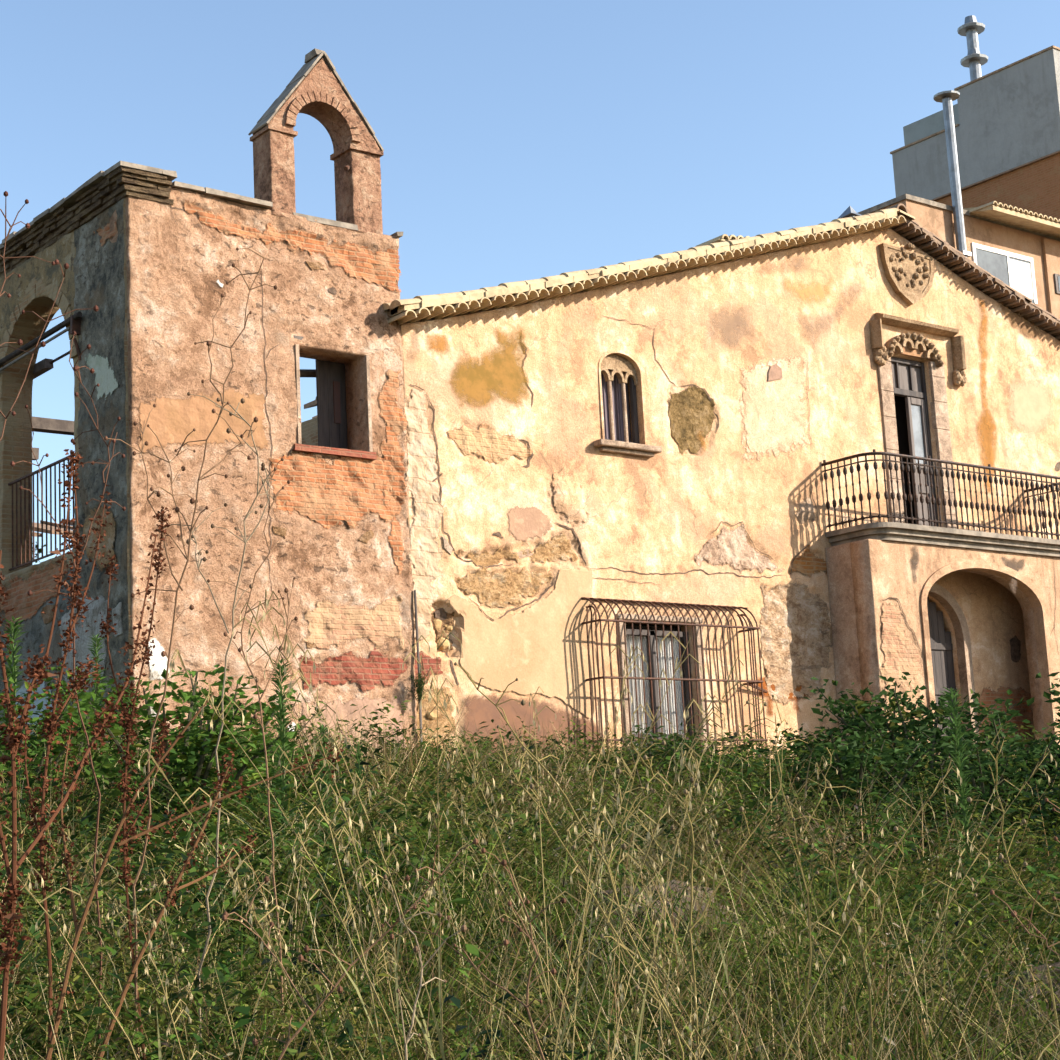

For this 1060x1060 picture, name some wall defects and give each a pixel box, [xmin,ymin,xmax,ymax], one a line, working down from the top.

flaking render [85,353,118,400]
crack [601,315,677,387]
flaking render [667,384,719,455]
flaking render [269,369,586,751]
crack [593,567,779,586]
flaking render [694,521,832,705]
peeling [59,595,123,715]
flaking render [880,597,923,732]
water stain [464,695,601,766]